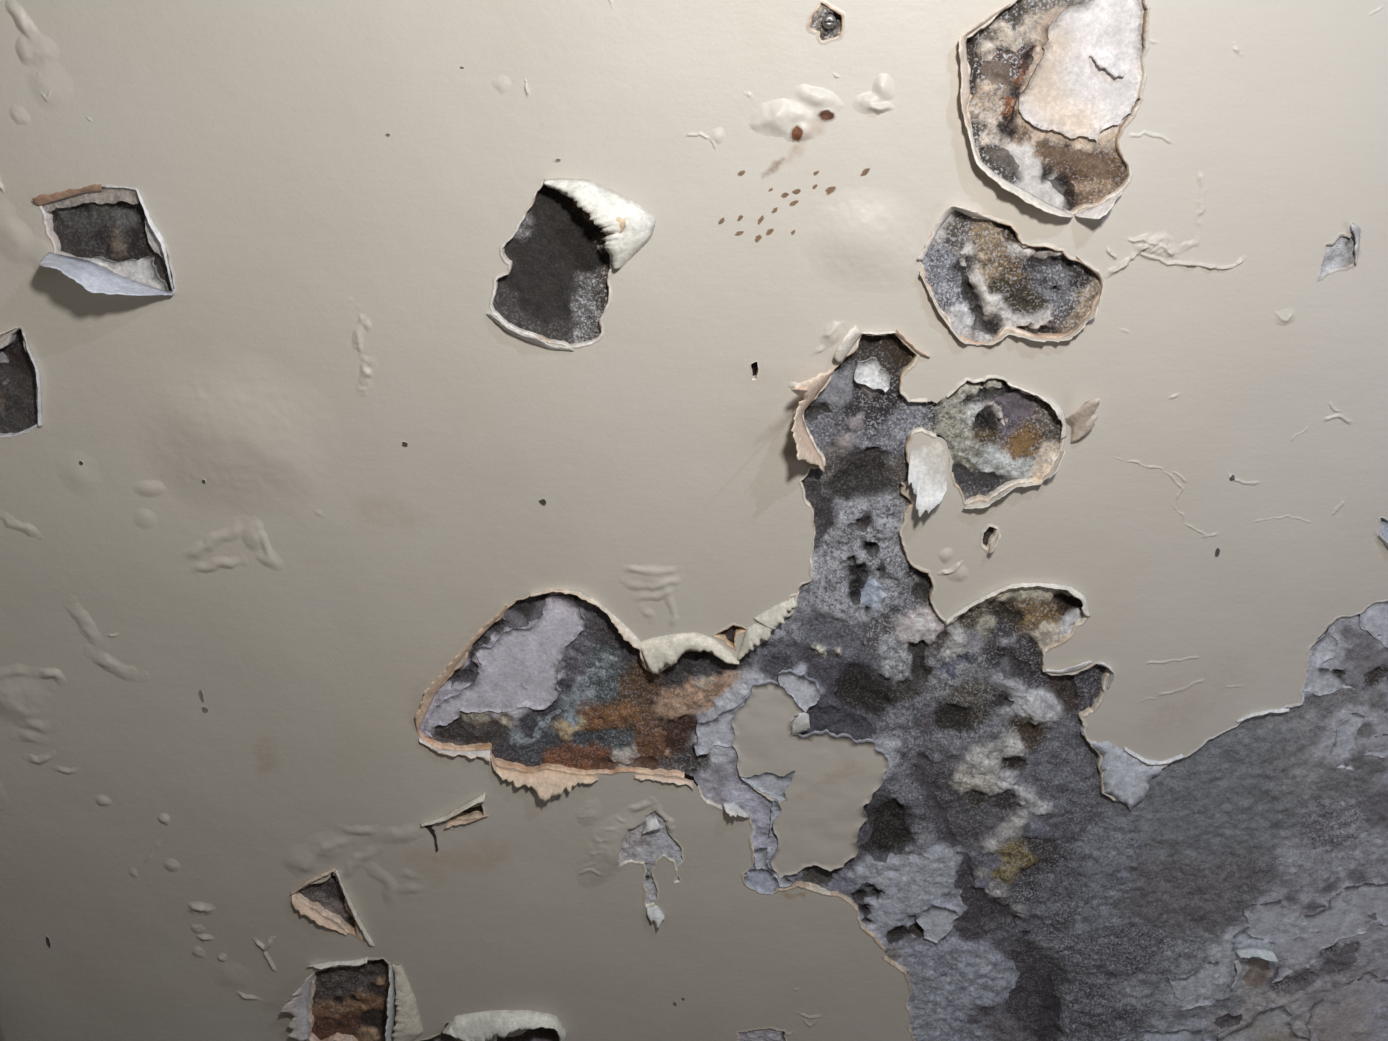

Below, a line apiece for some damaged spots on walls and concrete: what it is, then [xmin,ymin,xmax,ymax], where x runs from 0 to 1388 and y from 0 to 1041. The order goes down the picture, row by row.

spalling [959,0,1152,219]
spalling [32,183,176,297]
spalling [486,179,656,351]
spalling [917,205,1104,347]
peeling [1316,221,1363,282]
spalling [0,326,43,439]
spalling [749,361,760,381]
flaking render [778,333,1388,1041]
spalling [414,588,959,1041]
spalling [281,869,567,1041]